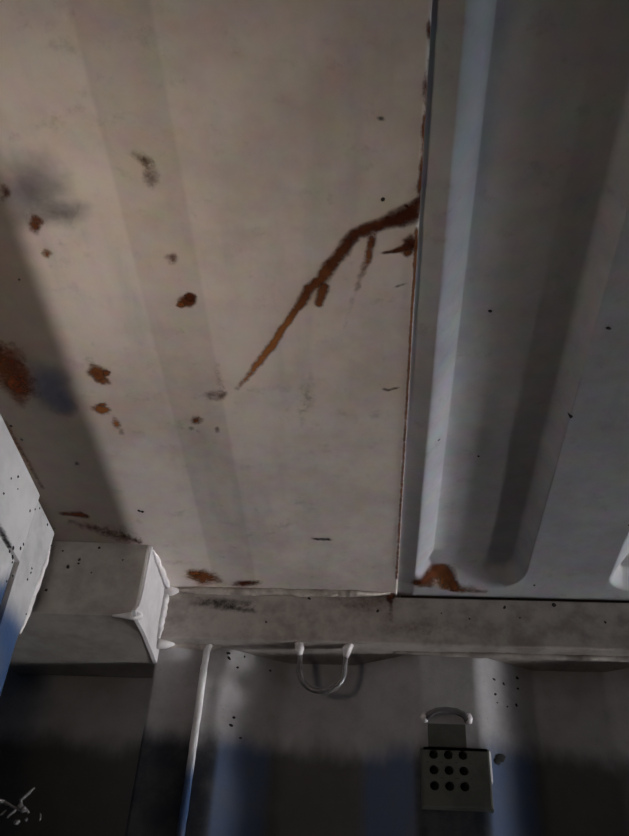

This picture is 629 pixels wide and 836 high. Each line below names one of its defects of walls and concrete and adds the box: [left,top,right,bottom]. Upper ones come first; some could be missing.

rust [176,293,196,307]
rust [239,79,428,579]
rust [0,347,34,404]
rust [87,365,110,385]
rust [189,571,221,584]
rust [412,564,487,593]